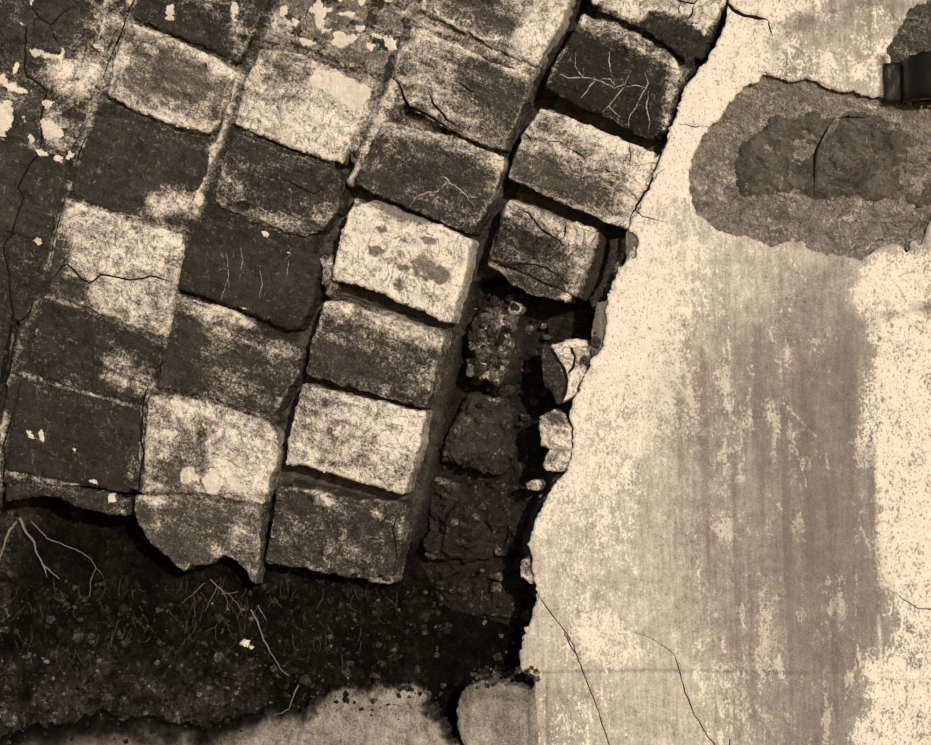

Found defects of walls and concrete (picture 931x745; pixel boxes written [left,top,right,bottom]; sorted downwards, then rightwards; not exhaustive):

spalling [886,0,931,63]
spalling [689,75,931,260]
crack [0,0,172,493]
spalling [461,291,551,427]
spalling [580,298,608,366]
spalling [480,568,526,609]
crack [537,594,610,745]
crack [635,632,730,745]